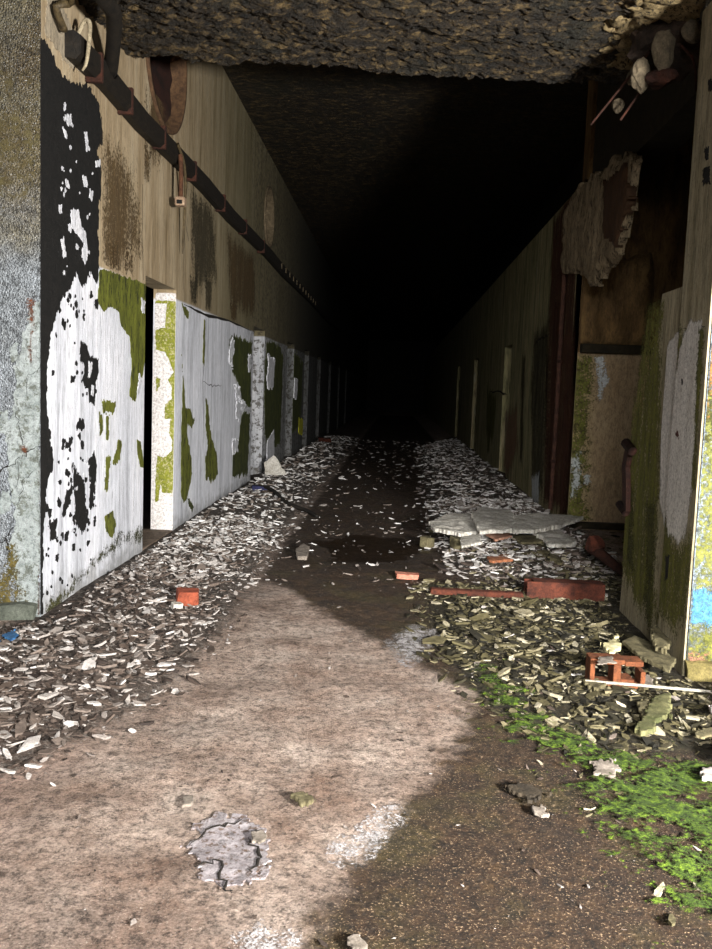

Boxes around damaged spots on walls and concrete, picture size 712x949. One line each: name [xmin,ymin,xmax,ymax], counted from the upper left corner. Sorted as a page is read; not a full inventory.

spalling [590,0,712,125]
spalling [0,0,218,617]
peeling [228,334,252,479]
peeling [264,340,303,461]